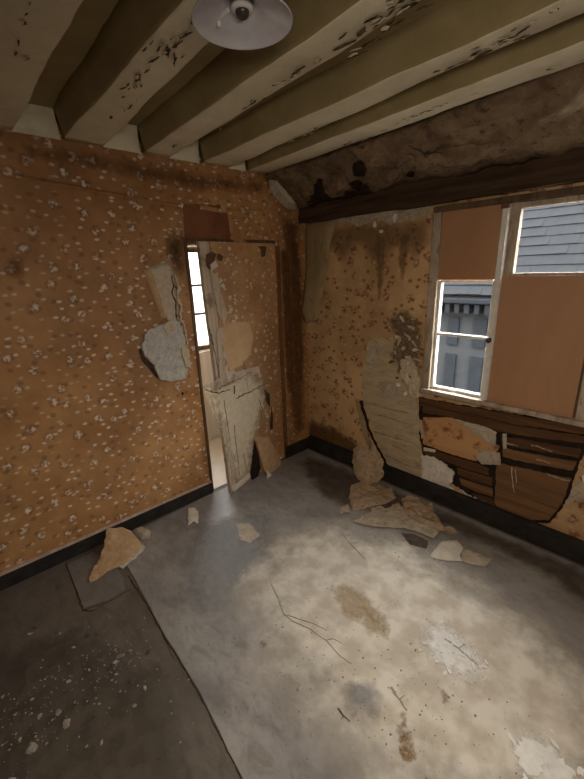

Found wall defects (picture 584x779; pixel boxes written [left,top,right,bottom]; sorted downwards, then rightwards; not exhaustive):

peeling [119,22,193,98]
peeling [333,0,434,59]
peeling [433,19,539,73]
leakage [331,226,422,289]
flaking render [139,318,191,382]
leakage [391,313,421,378]
flaking render [384,316,584,523]
crack [269,579,352,664]
leakage [190,517,584,779]
peeling [508,729,584,779]